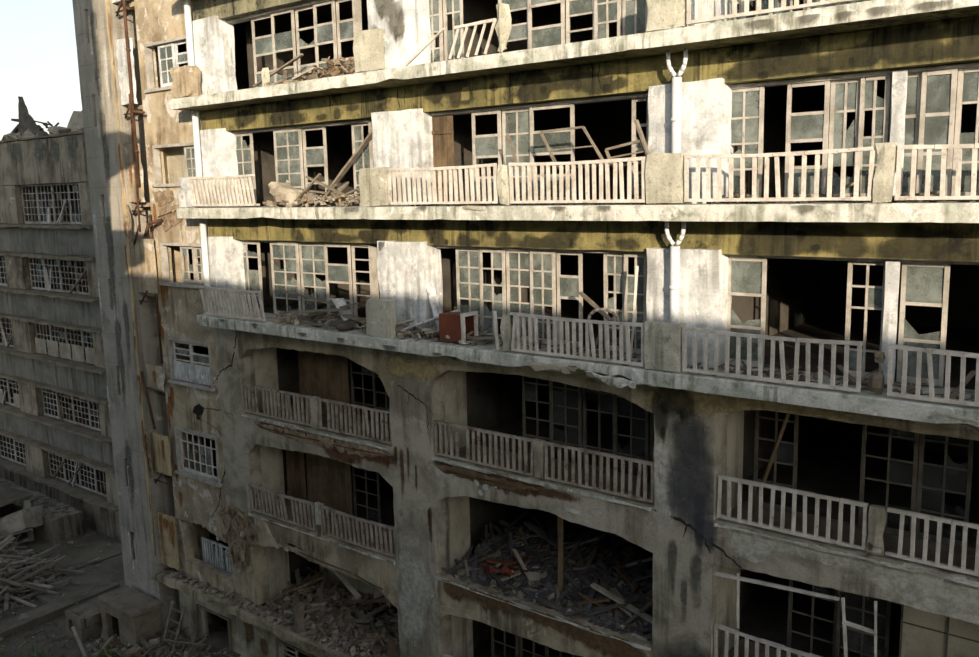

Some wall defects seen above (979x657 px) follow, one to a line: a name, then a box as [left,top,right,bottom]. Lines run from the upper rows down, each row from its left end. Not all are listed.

damp [372,0,405,39]
damp [235,109,255,128]
damp [424,80,473,108]
damp [518,70,625,102]
crack [200,331,237,437]
rust [257,422,417,493]
damp [647,387,848,547]
crack [654,509,742,568]
damp [668,542,702,614]